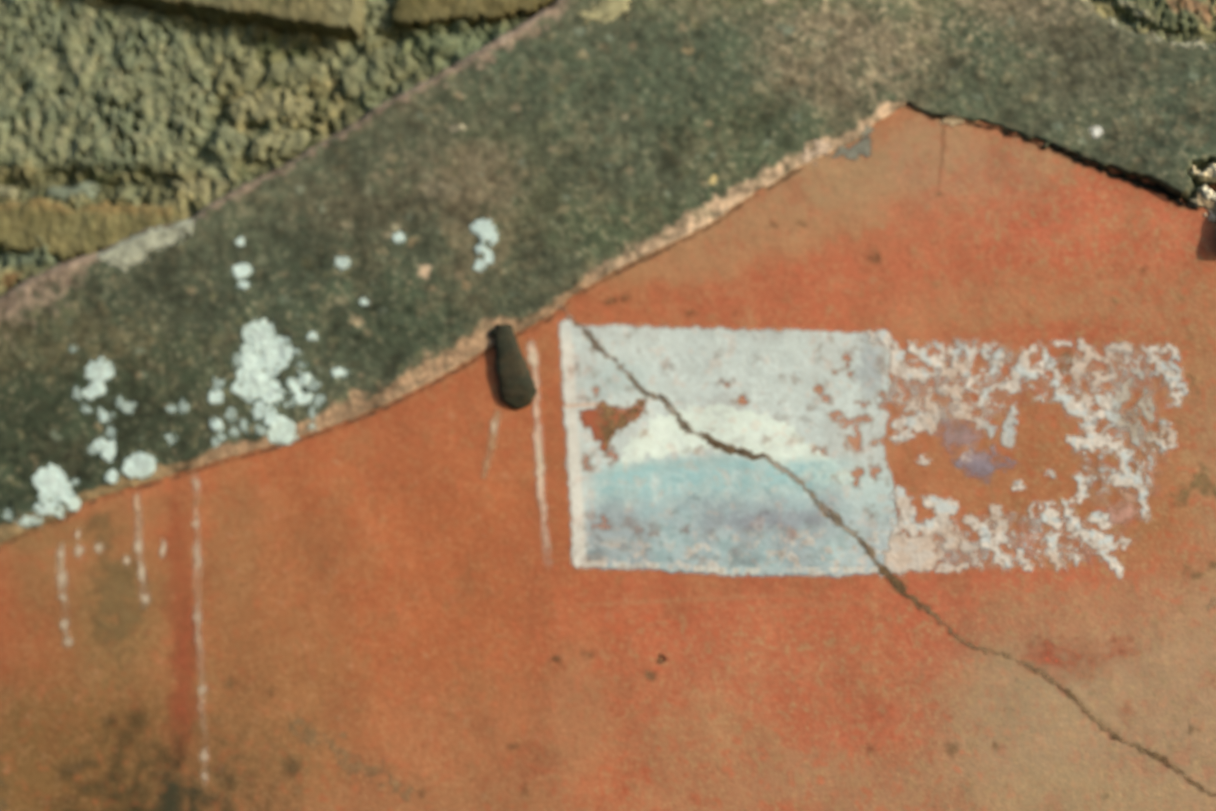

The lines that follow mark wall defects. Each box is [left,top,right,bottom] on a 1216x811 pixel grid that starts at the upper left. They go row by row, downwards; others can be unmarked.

peeling [581,401,644,451]
peeling [866,329,1188,578]
water stain [58,531,102,600]
water stain [98,494,149,641]
crack [561,306,1216,795]
water stain [111,751,207,811]